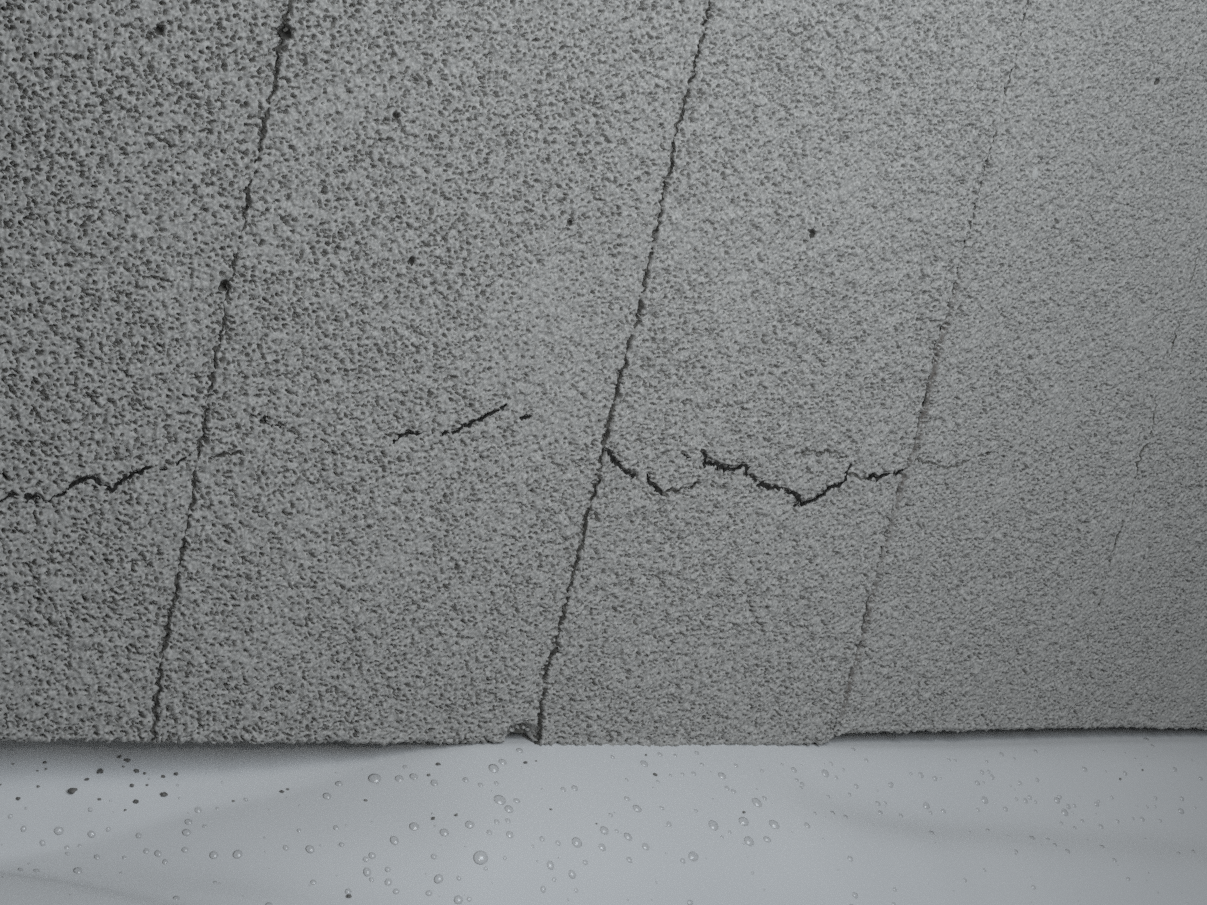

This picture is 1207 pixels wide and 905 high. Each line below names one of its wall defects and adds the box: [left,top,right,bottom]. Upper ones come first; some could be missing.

crack [0,0,293,741]
crack [259,413,300,437]
crack [393,404,532,444]
crack [535,0,1029,745]